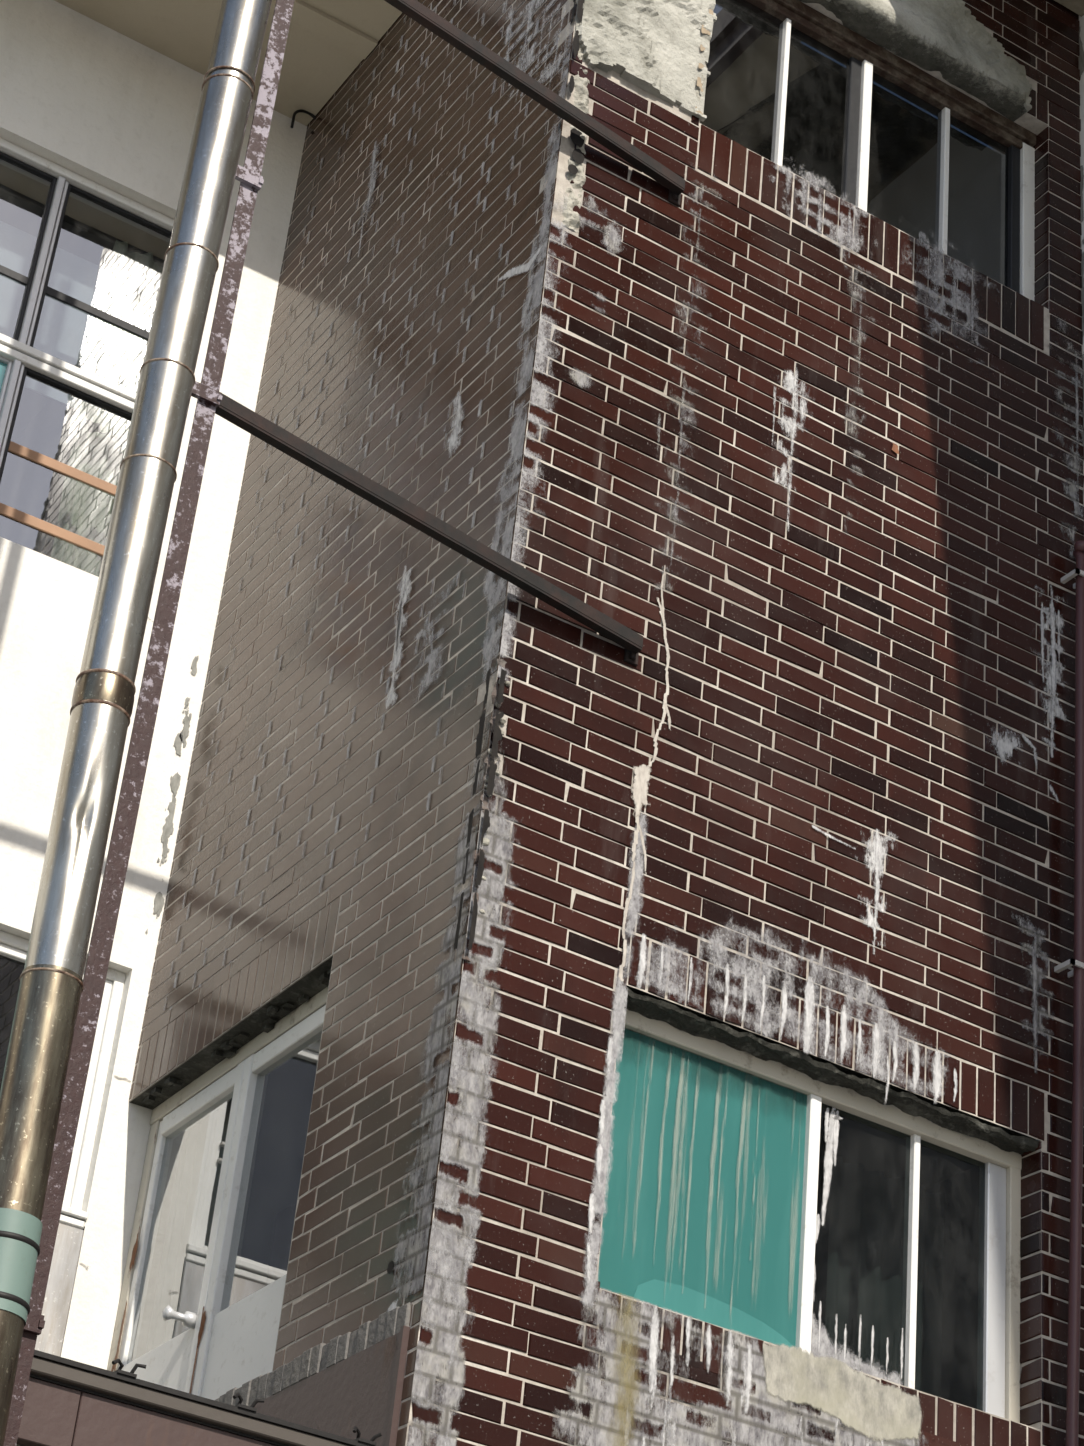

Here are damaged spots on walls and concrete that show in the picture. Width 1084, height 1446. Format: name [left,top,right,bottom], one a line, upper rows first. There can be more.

spalling [569,0,717,122]
spalling [896,0,1032,114]
spalling [558,122,587,233]
efflorescence [773,165,868,257]
efflorescence [913,232,989,346]
efflorescence [772,371,806,529]
efflorescence [992,592,1065,765]
peeling [157,697,192,865]
crack [618,566,671,982]
peeling [145,892,164,933]
efflorescence [863,829,895,952]
damp [557,920,957,1446]